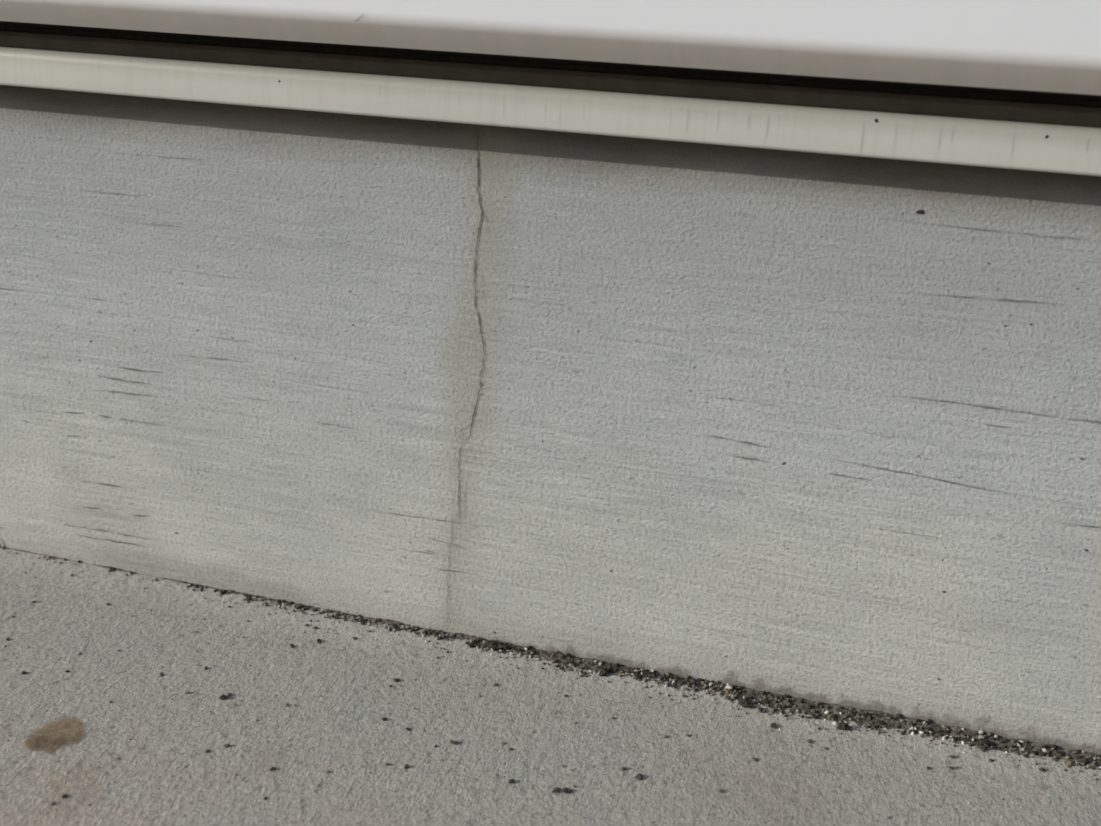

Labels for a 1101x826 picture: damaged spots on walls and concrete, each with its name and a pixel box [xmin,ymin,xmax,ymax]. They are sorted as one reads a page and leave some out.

crack [446,125,488,624]